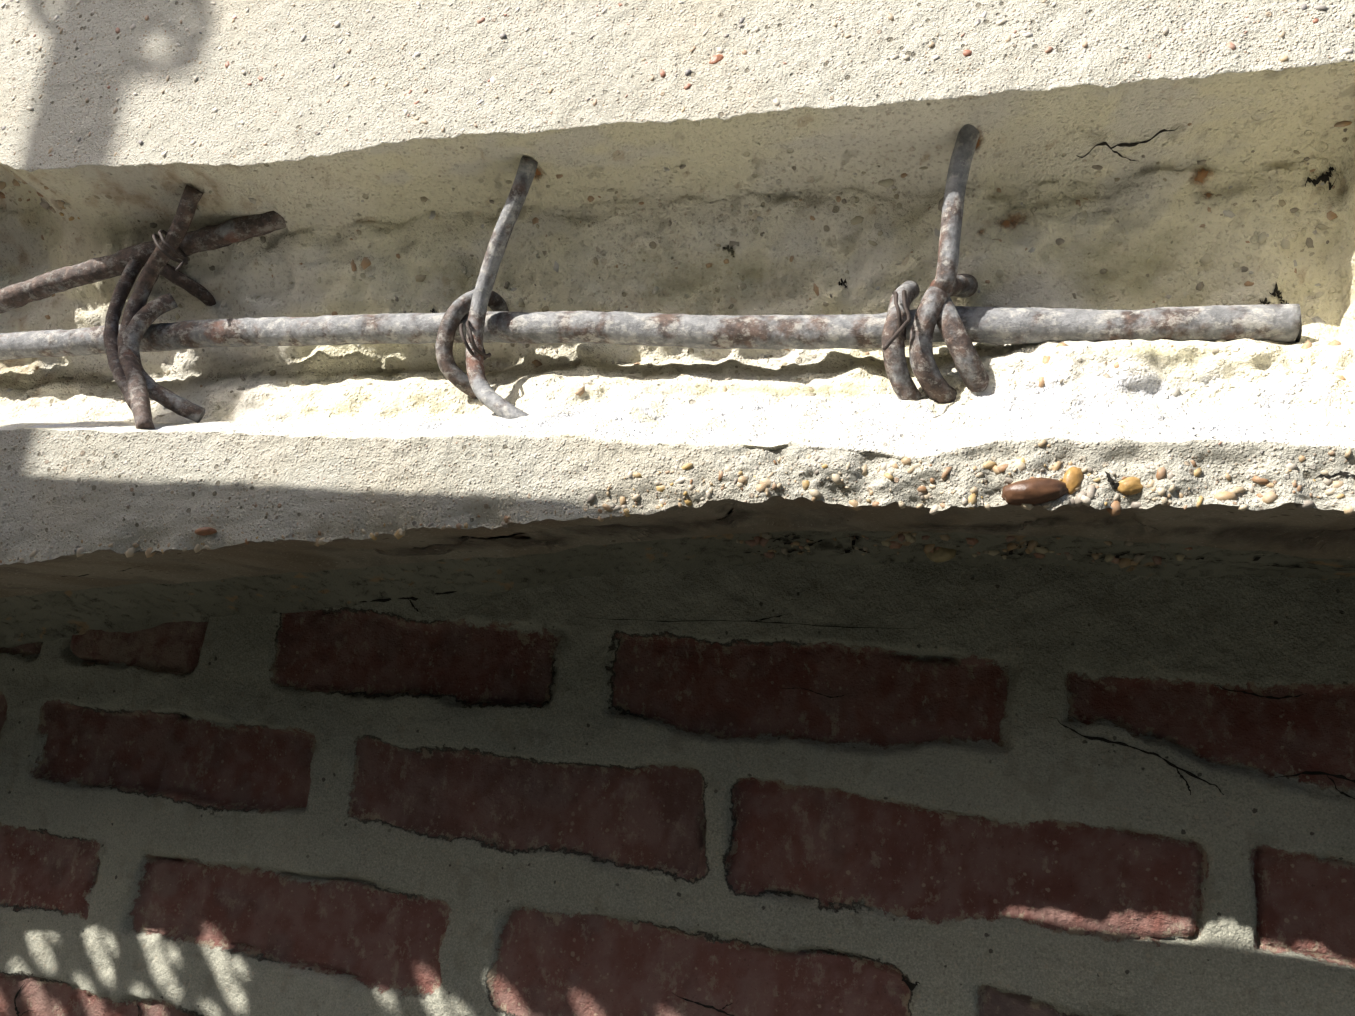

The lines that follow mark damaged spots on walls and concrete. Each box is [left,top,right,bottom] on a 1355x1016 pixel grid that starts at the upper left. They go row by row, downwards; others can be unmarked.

crack [1076,129,1175,161]
corrosion [1000,214,1025,228]
spalling [0,0,1355,522]
crack [1051,717,1224,795]
crack [1275,771,1355,799]